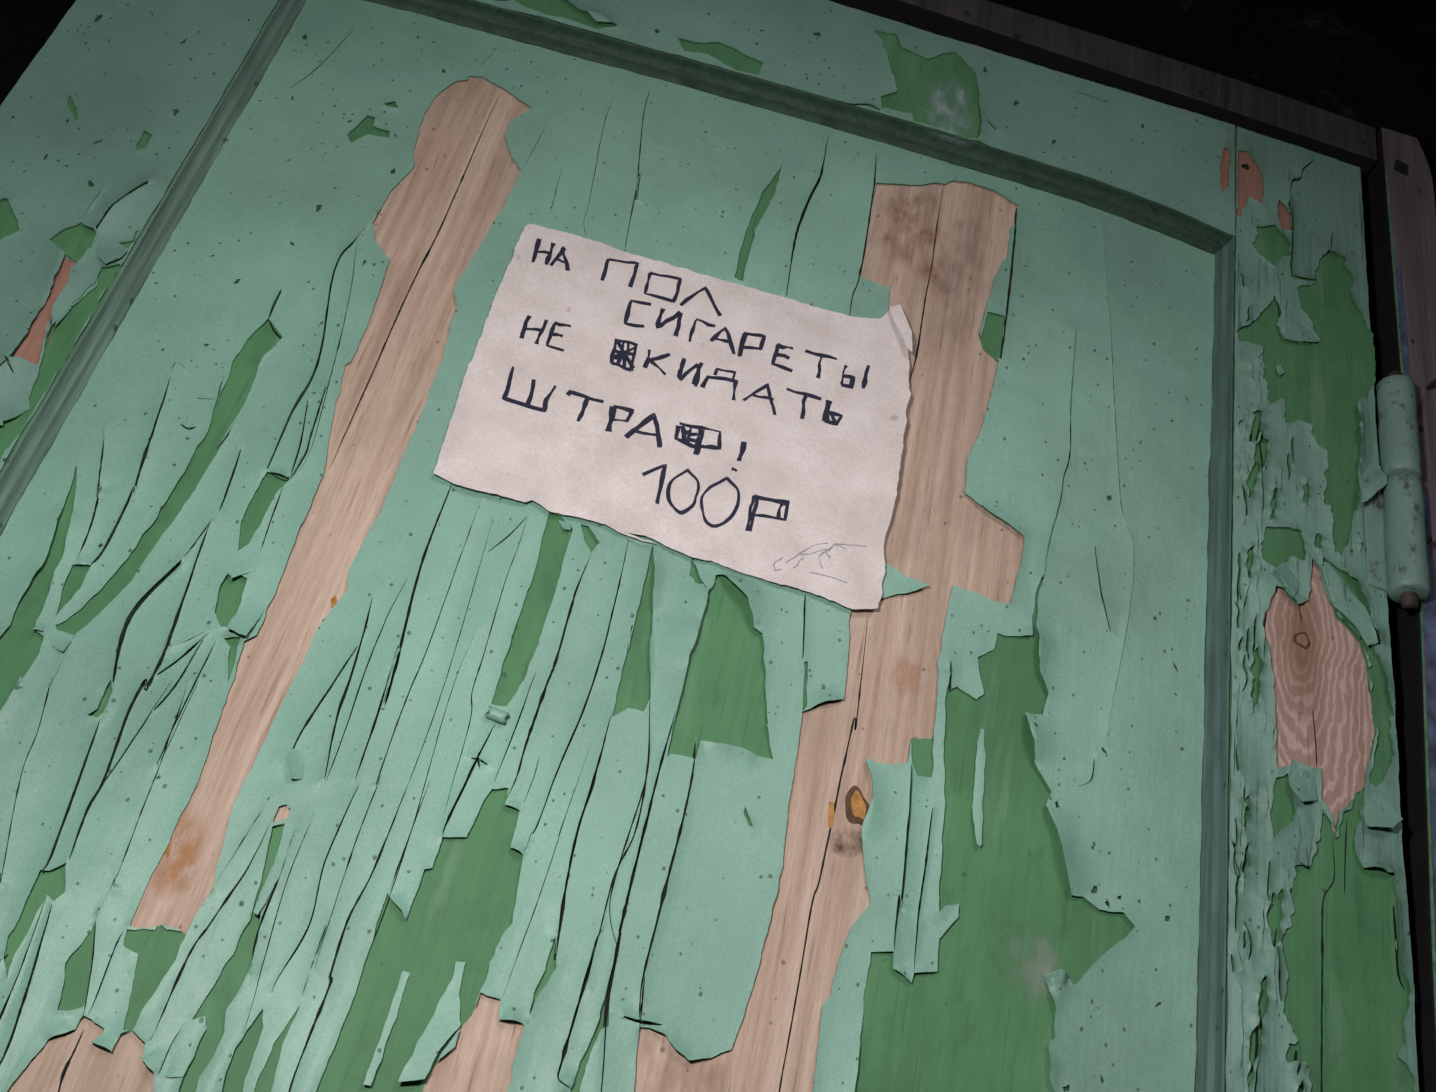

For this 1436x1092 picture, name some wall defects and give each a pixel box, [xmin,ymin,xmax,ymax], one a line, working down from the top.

peeling [514,0,615,34]
peeling [874,31,987,143]
peeling [1219,147,1293,266]
peeling [0,70,556,1092]
peeling [485,513,599,724]
peeling [613,546,655,716]
peeling [634,167,1134,1092]
peeling [1237,251,1415,1092]
peeling [568,977,610,1092]